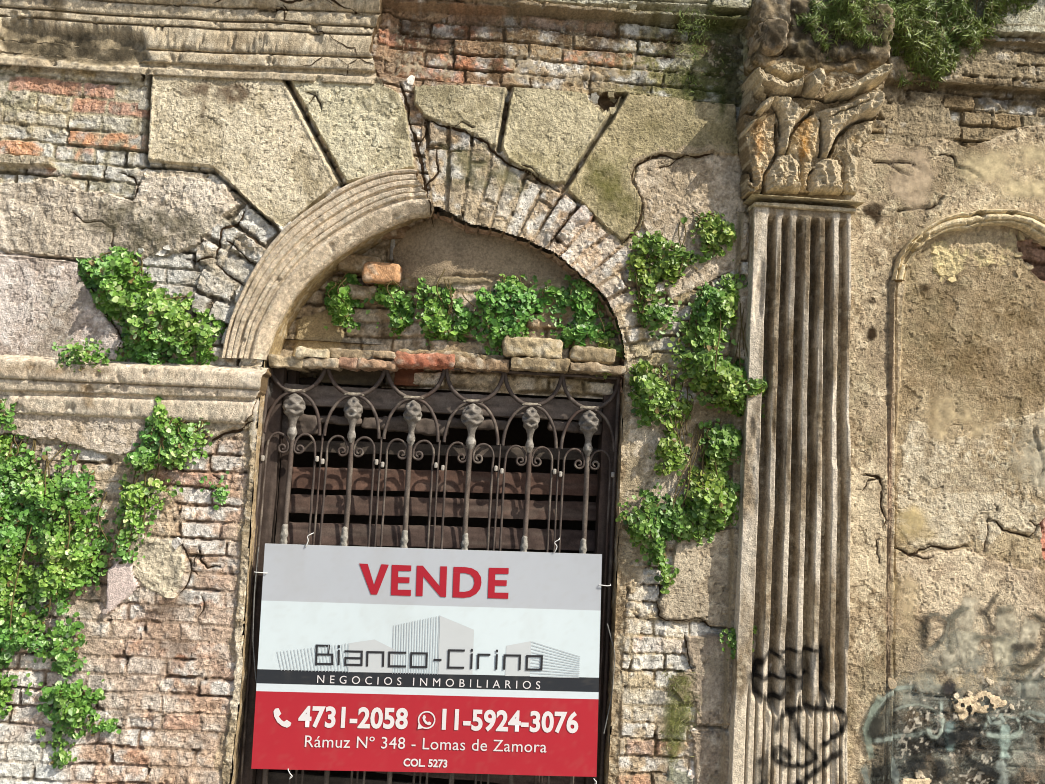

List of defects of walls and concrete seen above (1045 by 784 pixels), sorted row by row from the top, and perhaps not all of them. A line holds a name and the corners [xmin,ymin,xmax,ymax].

crack [270,0,560,226]
spalling [382,0,751,118]
flaking render [931,231,1045,283]
crack [862,473,1045,563]
spalling [881,651,1045,784]